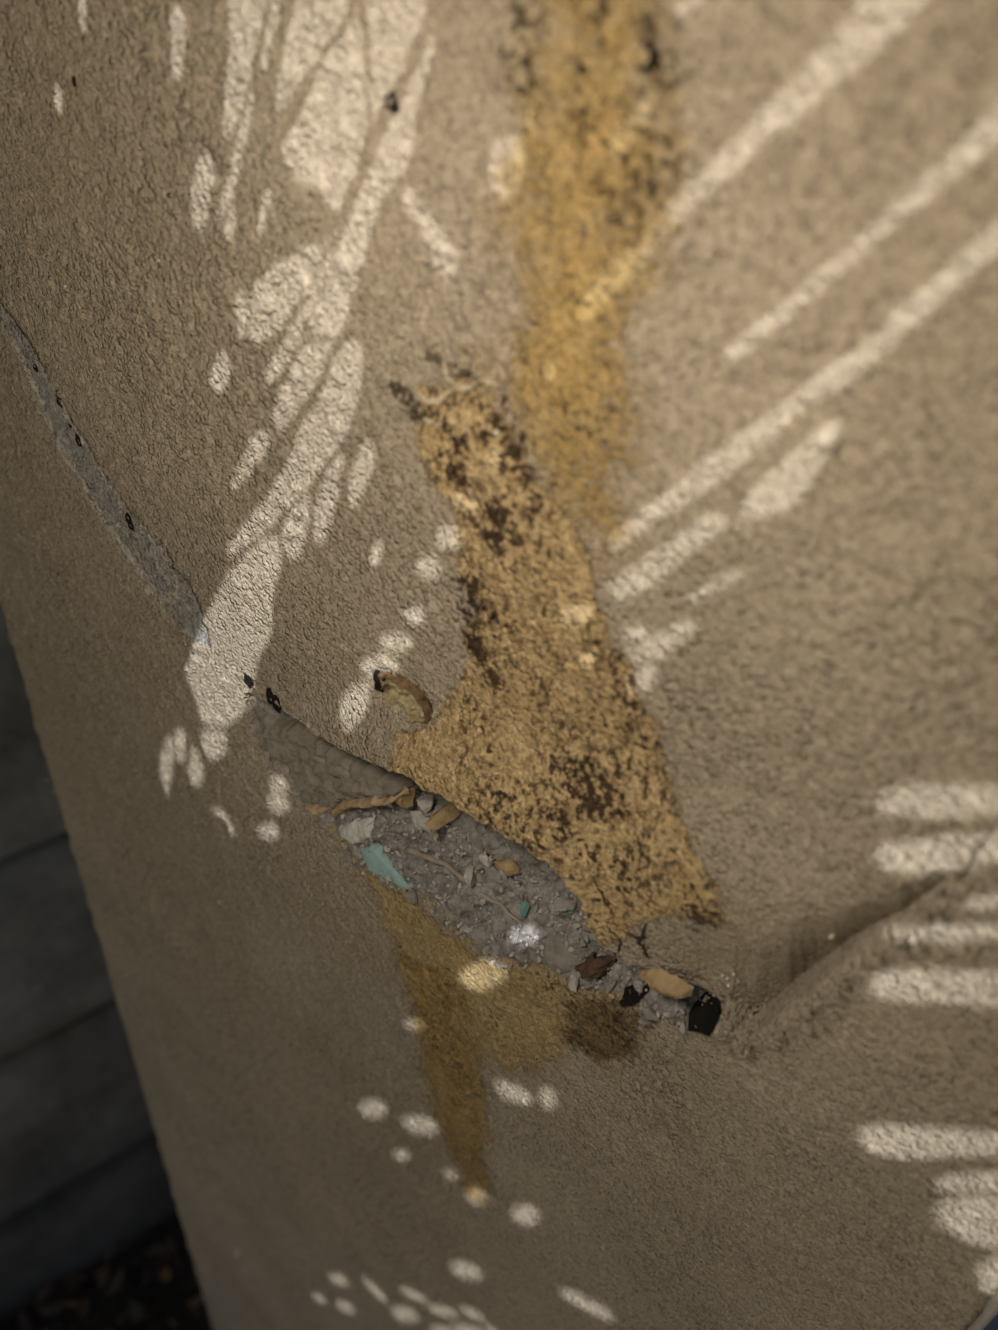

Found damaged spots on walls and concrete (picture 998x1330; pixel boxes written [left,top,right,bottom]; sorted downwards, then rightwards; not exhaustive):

rust [469,0,698,555]
crack [0,302,211,648]
crack [244,673,282,714]
peeling [251,375,732,1037]
rust [345,841,646,1203]
crack [721,819,998,1059]